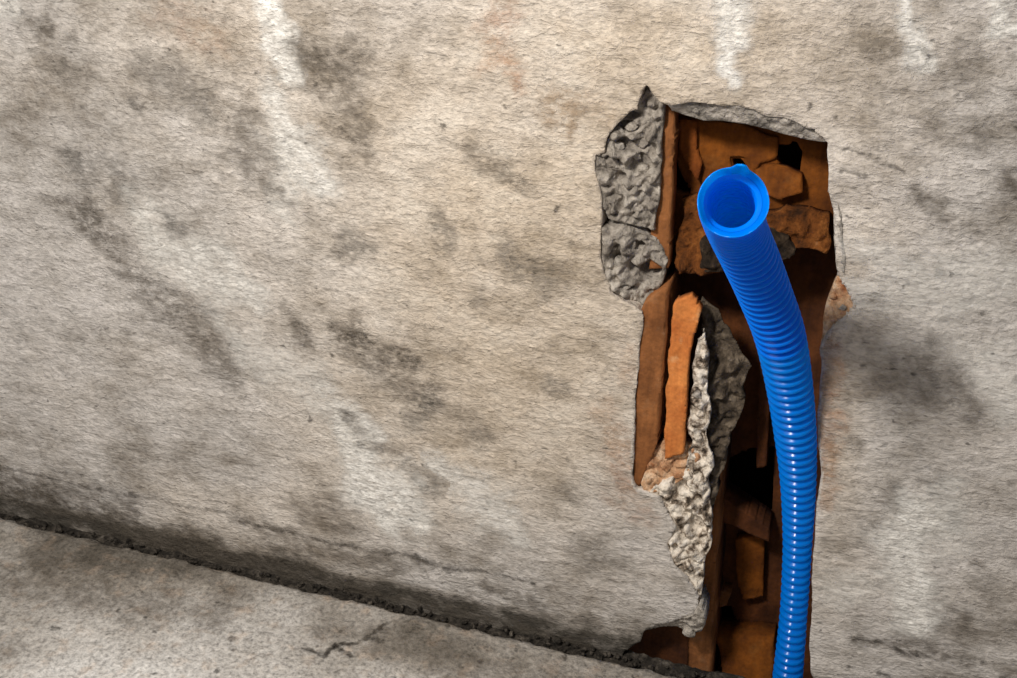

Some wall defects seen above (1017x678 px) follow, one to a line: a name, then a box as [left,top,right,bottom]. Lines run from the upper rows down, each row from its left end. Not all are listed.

flaking render [595,86,827,305]
flaking render [822,191,856,339]
flaking render [641,327,715,637]
crack [0,514,745,678]